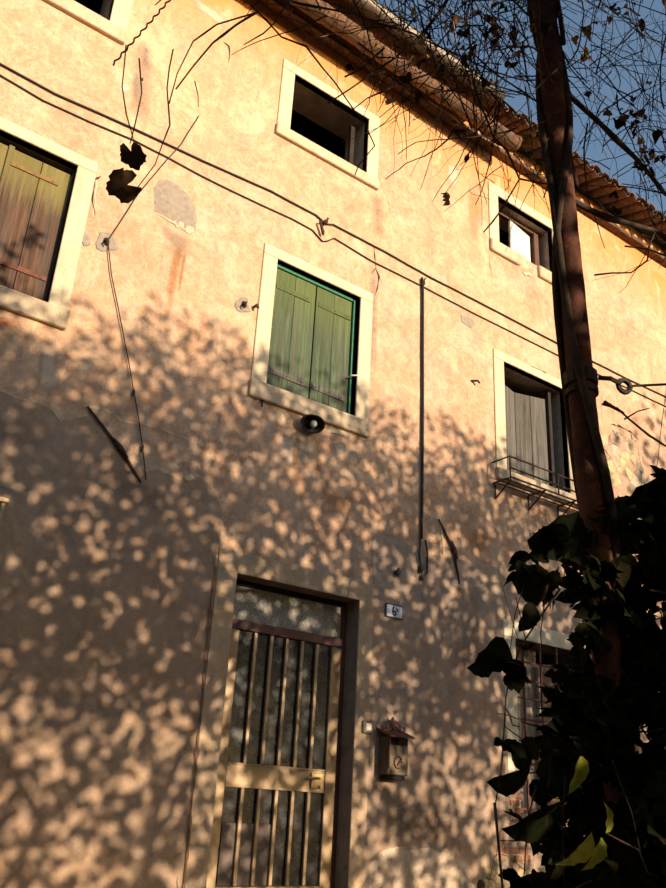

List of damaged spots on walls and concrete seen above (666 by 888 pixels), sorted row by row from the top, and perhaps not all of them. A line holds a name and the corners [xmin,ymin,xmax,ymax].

flaking render [604,430,645,498]
flaking render [509,793,523,821]